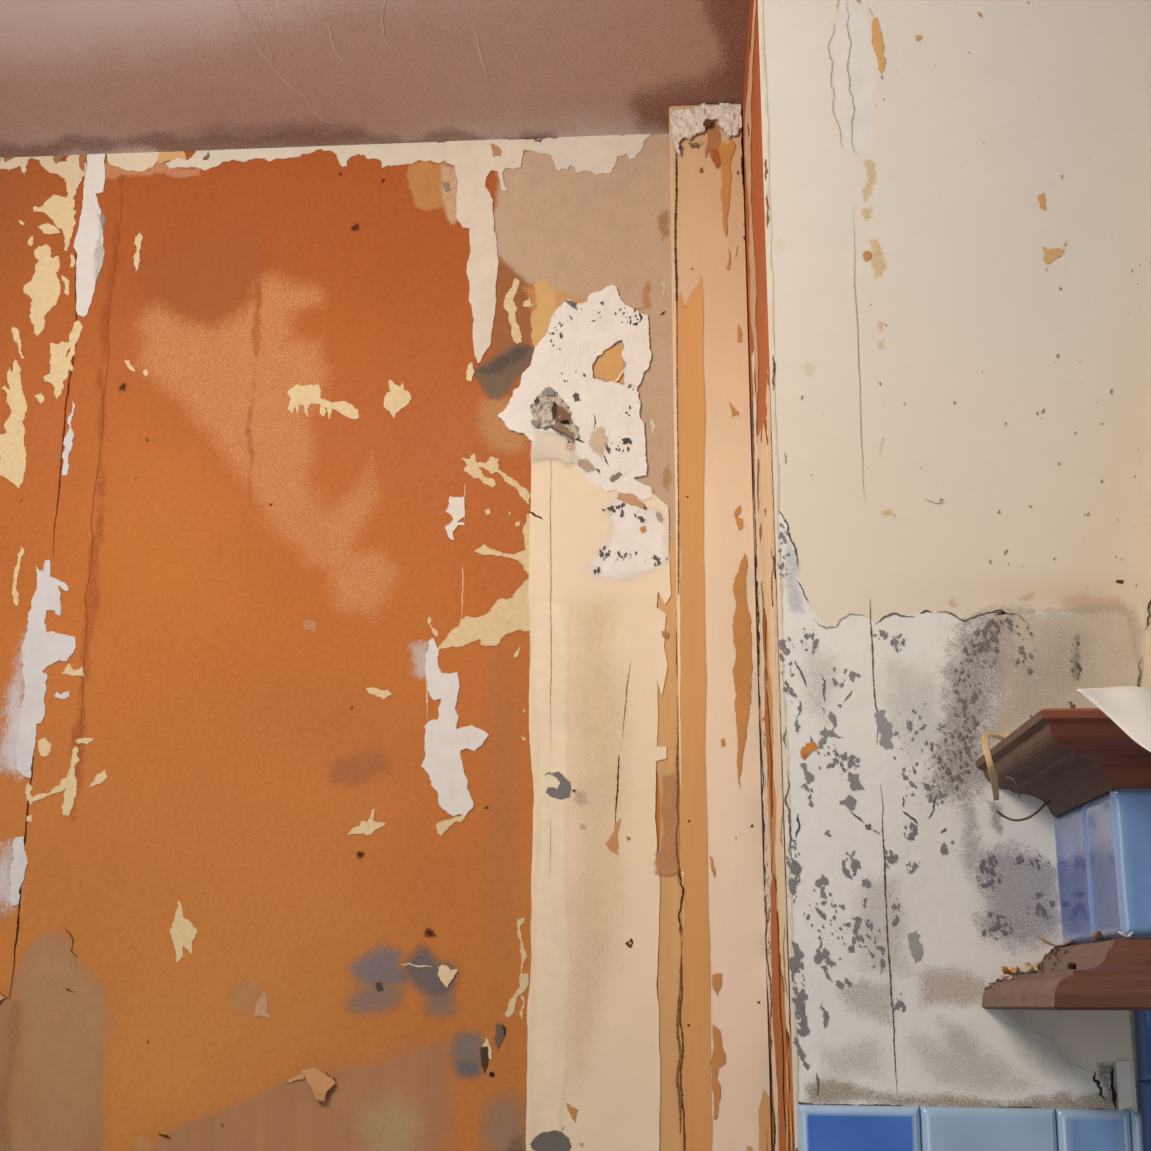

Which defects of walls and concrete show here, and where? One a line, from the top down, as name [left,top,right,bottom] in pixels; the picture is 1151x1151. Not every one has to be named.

damp [0,0,750,190]
crack [828,0,873,153]
crack [24,753,34,846]
peeling [16,560,95,822]
crack [53,175,125,822]
flaking render [0,102,743,586]
peeling [421,638,489,816]
damp [472,395,531,459]
damp [485,259,533,358]
peeling [677,276,726,1151]
flaking render [744,0,1148,1151]
damp [877,591,1127,955]